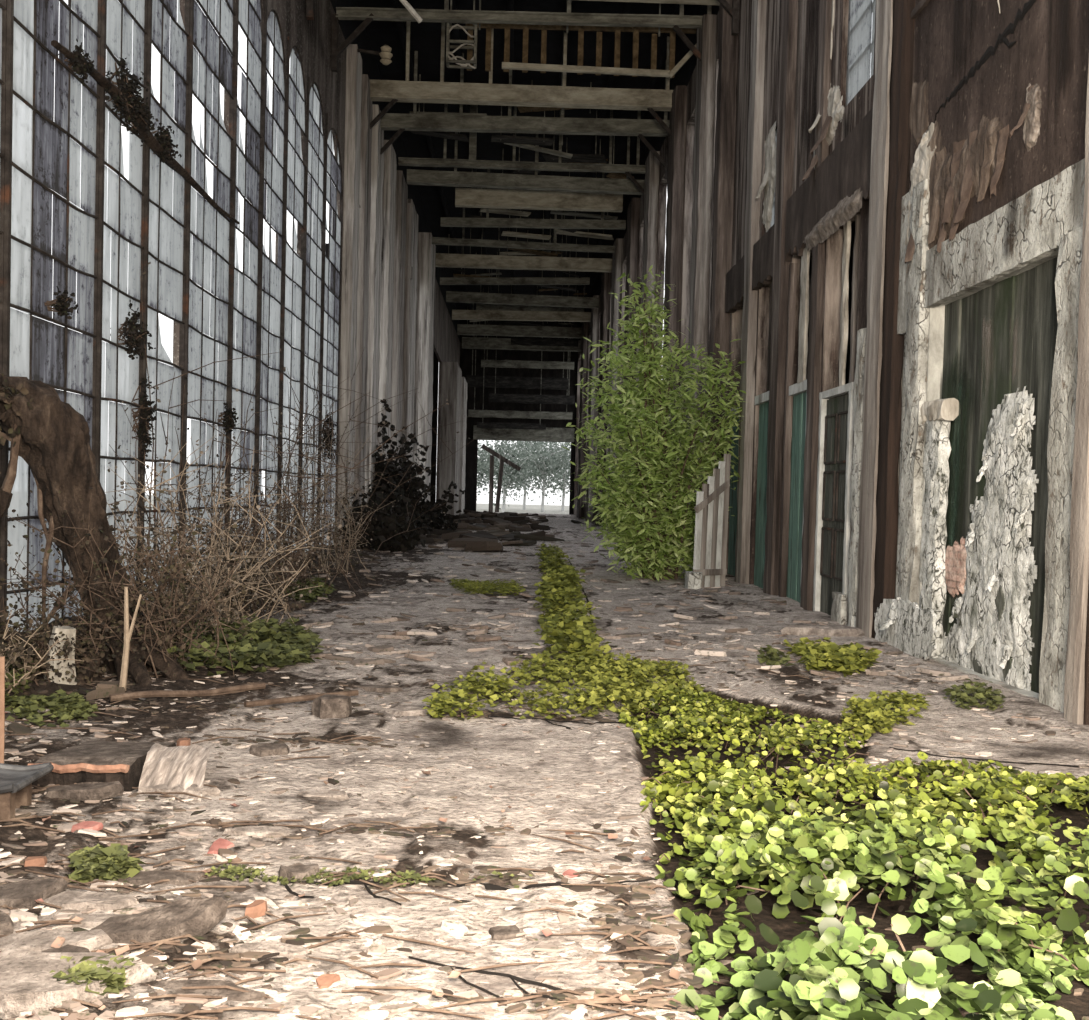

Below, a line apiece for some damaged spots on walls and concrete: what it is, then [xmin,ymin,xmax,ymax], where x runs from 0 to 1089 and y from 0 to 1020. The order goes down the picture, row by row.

peeling [904,80,1042,263]
peeling [781,386,1039,691]